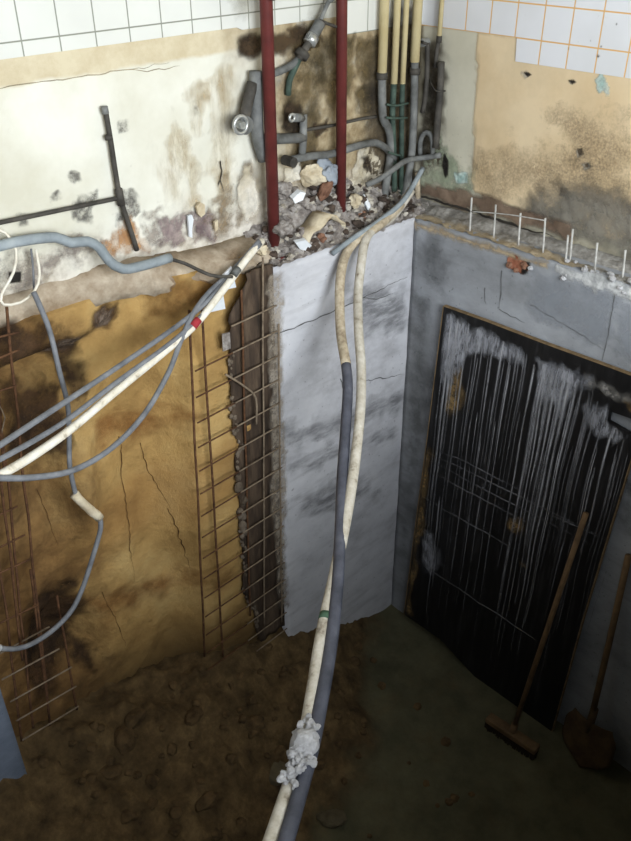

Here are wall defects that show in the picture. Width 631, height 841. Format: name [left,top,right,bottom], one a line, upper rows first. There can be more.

spalling [283,102,302,133]
peeling [420,33,631,240]
peeling [237,166,260,220]
damp [527,183,631,259]
crack [276,278,405,334]
crack [484,270,615,359]
spalling [556,259,631,300]
crack [118,436,189,564]
spalling [189,257,287,670]
damp [482,346,597,533]
damp [578,438,617,526]
damp [24,581,93,695]